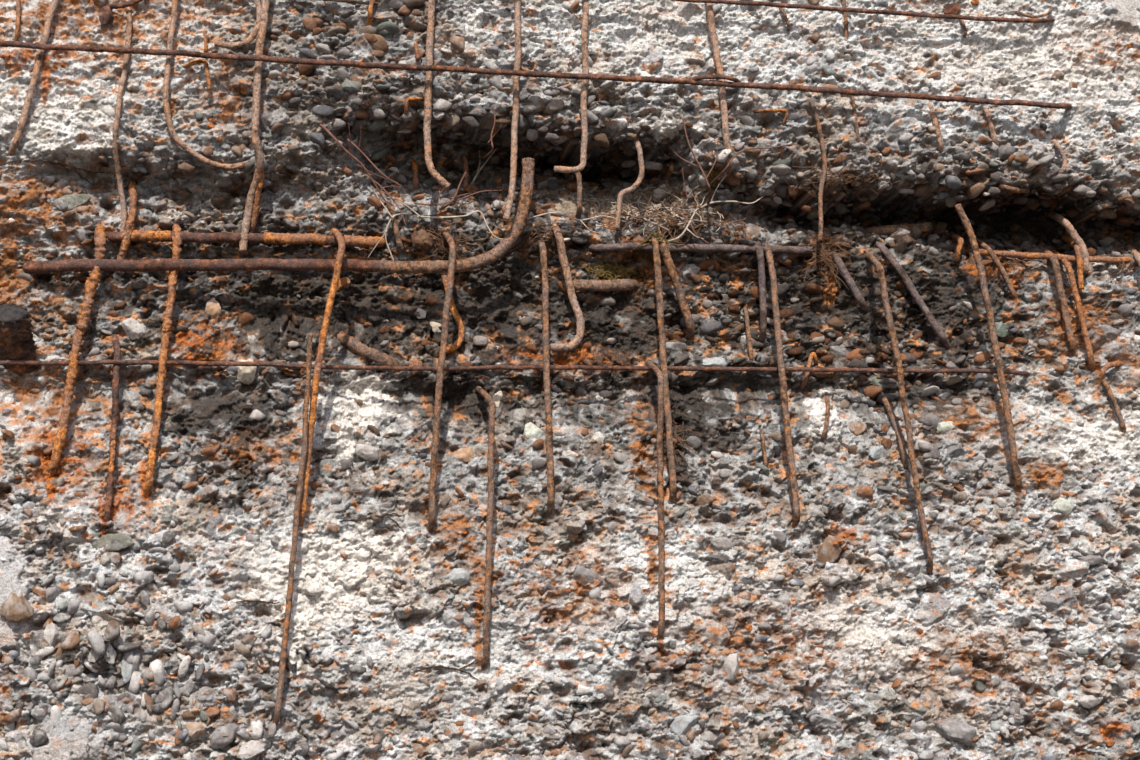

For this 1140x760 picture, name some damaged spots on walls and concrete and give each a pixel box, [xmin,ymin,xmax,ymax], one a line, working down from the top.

corrosion [0,0,169,104]
corrosion [0,180,76,318]
corrosion [75,189,138,331]
corrosion [162,223,235,361]
corrosion [2,370,108,499]
corrosion [97,424,150,536]
corrosion [628,402,657,498]
corrosion [945,400,1012,441]
corrosion [434,506,485,669]
corrosion [515,557,608,632]
corrosion [691,615,843,693]
corrosion [910,634,1015,688]